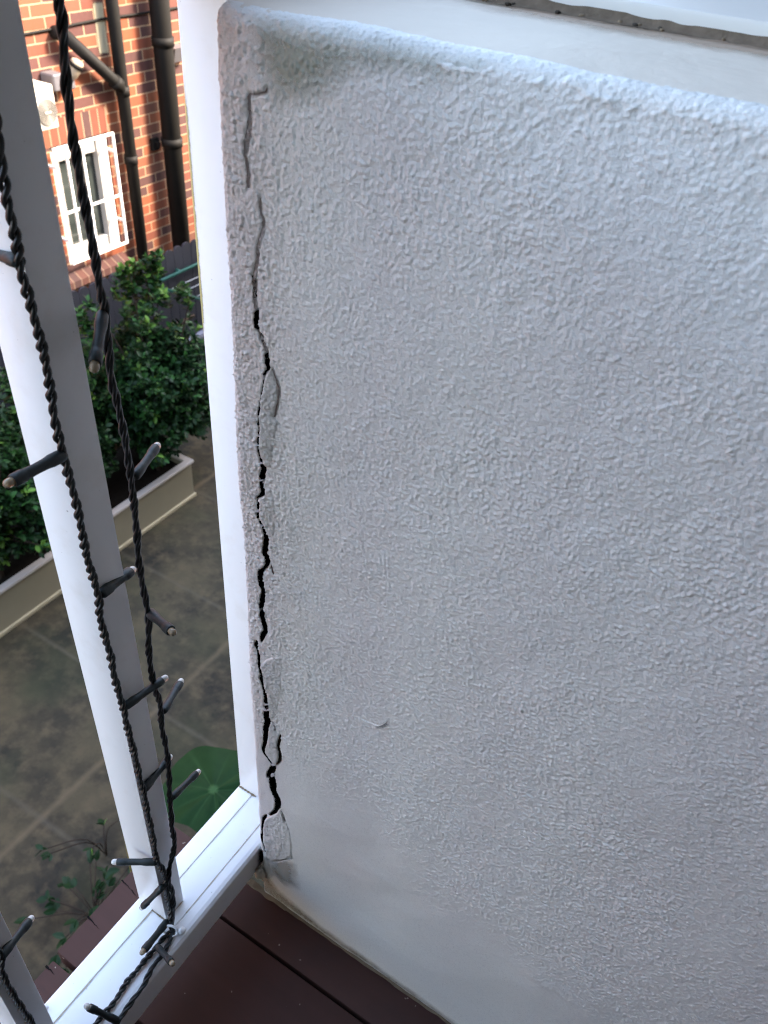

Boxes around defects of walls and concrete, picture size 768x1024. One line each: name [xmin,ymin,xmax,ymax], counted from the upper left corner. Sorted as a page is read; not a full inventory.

crack [243,87,285,865]